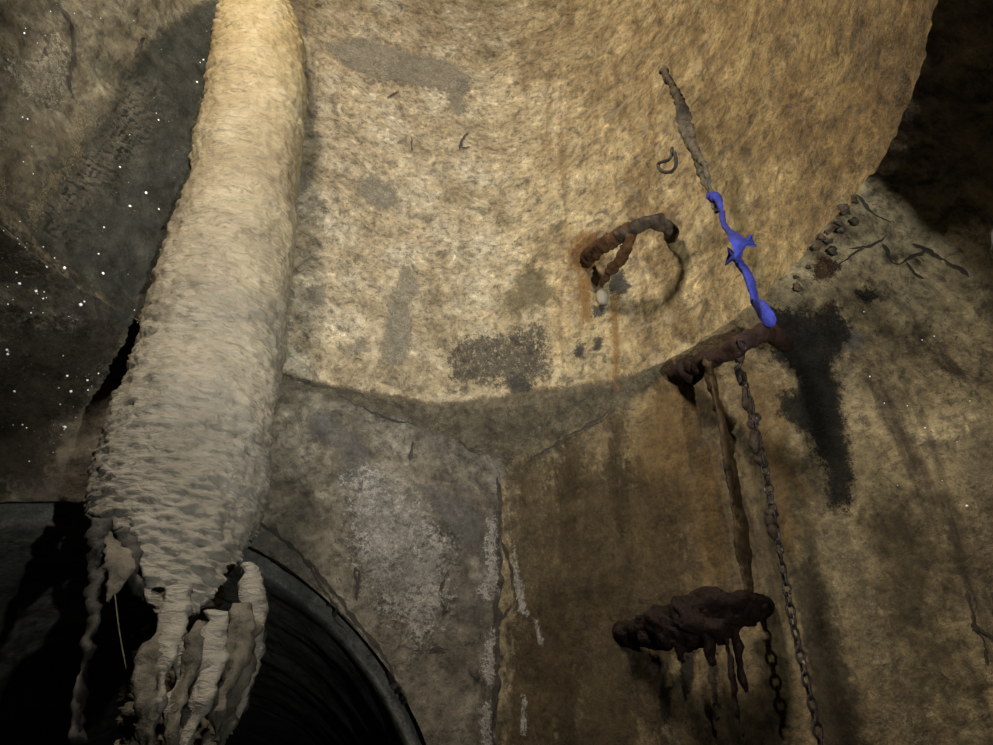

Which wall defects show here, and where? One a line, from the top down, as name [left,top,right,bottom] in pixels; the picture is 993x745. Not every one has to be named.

rust [568,231,637,321]
leakage [855,279,884,304]
crack [826,194,969,279]
leakage [282,264,722,745]
leakage [768,300,993,745]